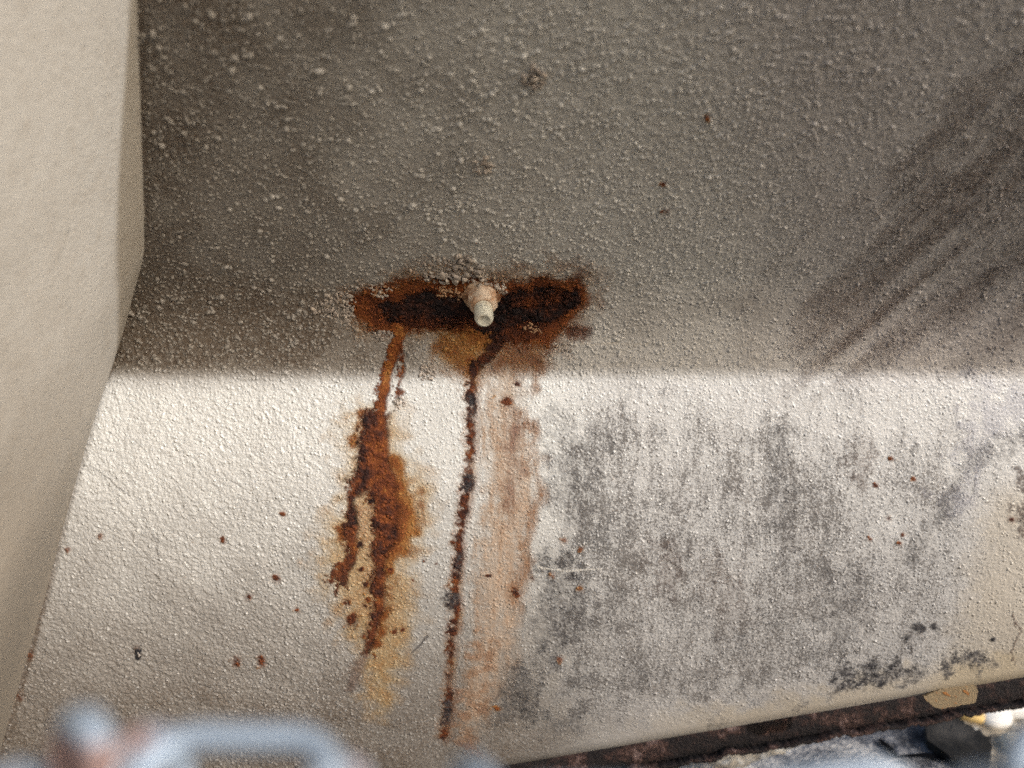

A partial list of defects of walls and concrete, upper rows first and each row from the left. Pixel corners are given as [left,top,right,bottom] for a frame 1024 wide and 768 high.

rust [323,276,590,747]
water stain [905,623,937,650]
water stain [831,656,922,692]
water stain [941,651,996,678]